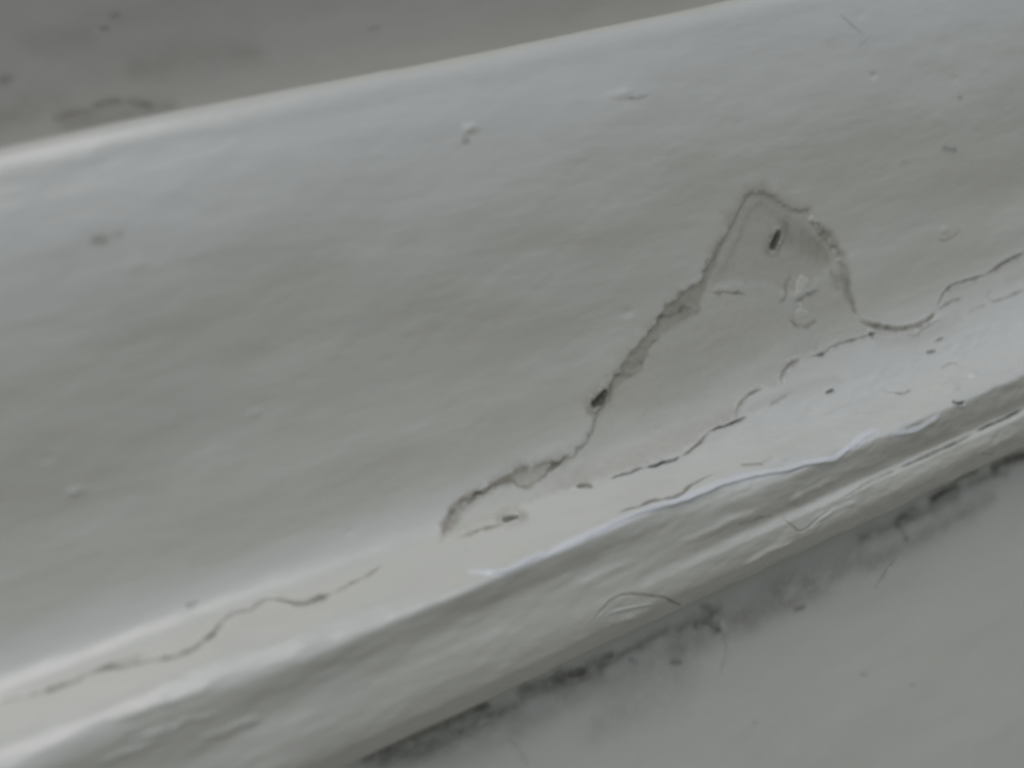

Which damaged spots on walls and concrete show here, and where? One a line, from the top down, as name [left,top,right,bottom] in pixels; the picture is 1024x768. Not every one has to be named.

peeling [467,428,878,576]
crack [612,418,744,479]